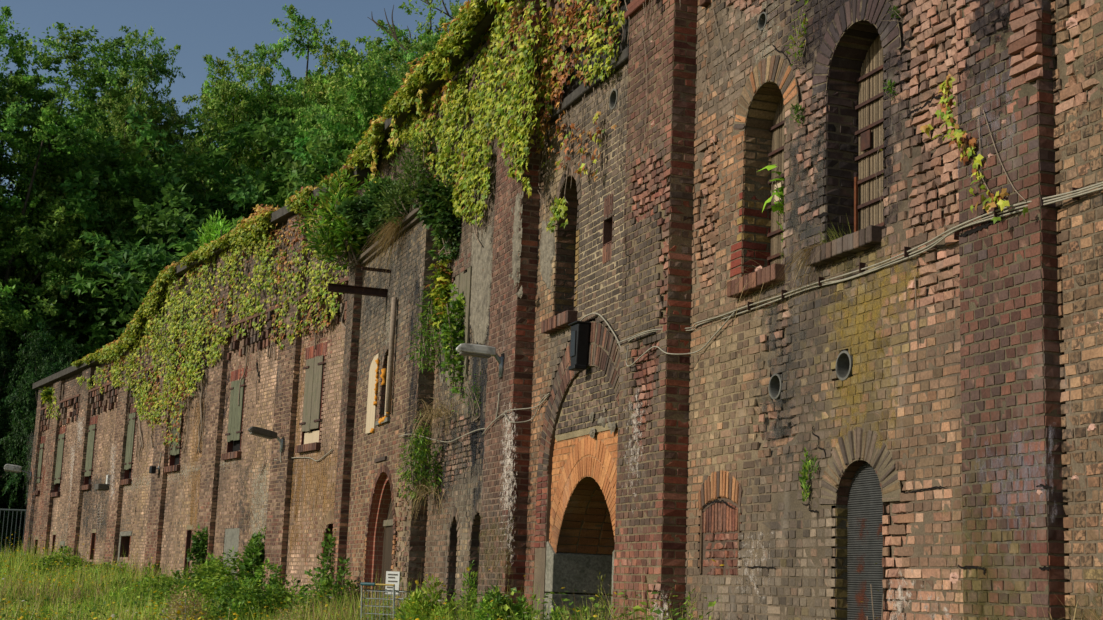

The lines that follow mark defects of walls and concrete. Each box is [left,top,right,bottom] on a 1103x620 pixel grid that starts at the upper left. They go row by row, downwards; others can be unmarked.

damp [500,408,517,545]